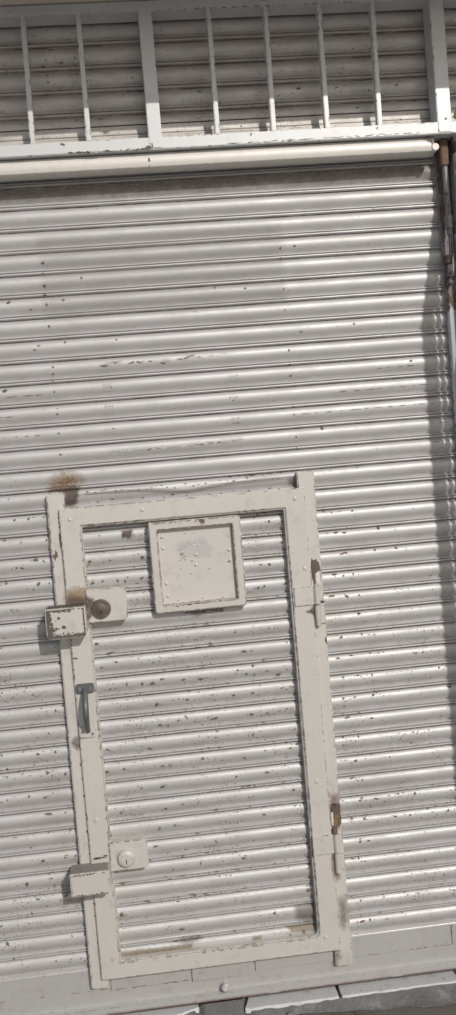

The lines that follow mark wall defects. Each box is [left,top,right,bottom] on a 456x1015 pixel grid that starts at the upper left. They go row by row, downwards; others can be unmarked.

rust [425,137,456,314]
rust [48,476,79,507]
peeling [11,502,62,570]
peeling [311,559,321,586]
rust [46,590,94,619]
peeling [21,602,86,663]
rust [330,798,341,827]